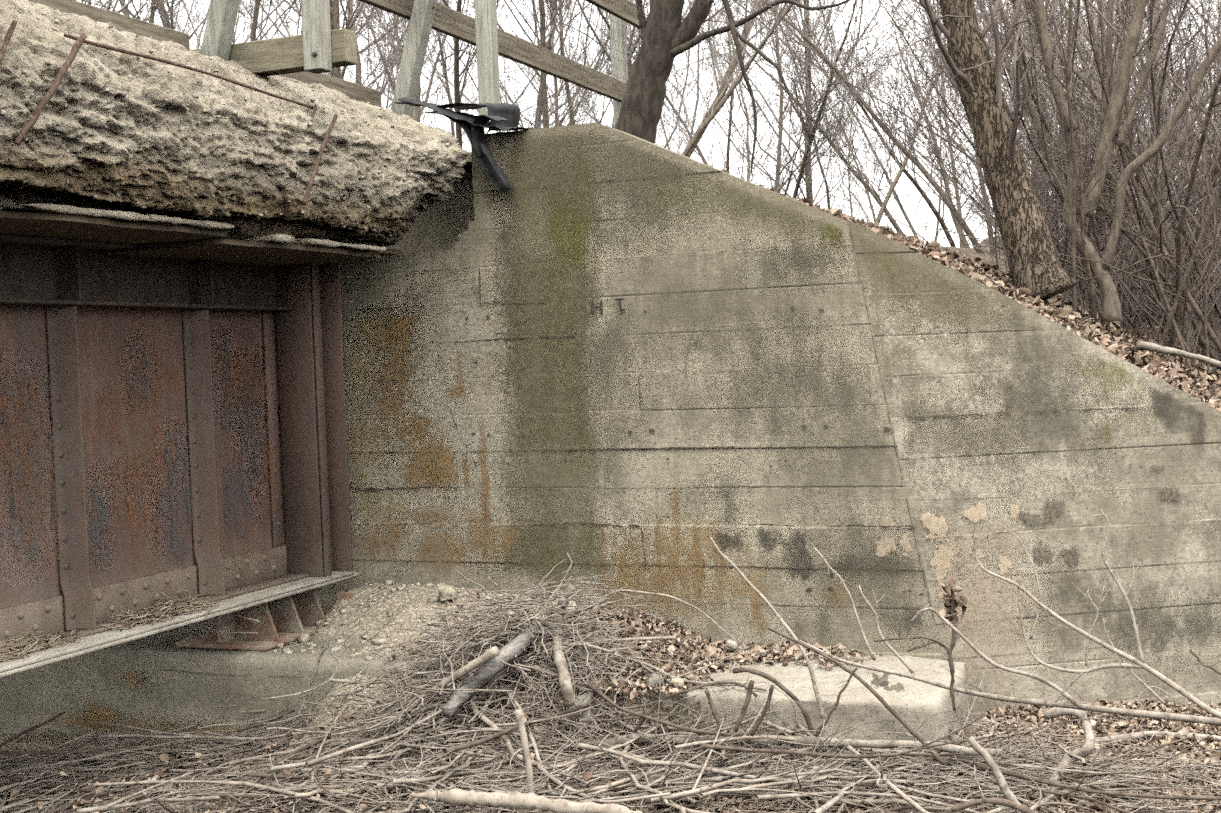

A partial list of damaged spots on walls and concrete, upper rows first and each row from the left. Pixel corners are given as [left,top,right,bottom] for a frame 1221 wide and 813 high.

spalling [0,0,468,247]
rust [403,412,467,490]
peeling [961,501,987,522]
peeling [875,512,1014,594]
rust [73,701,119,733]